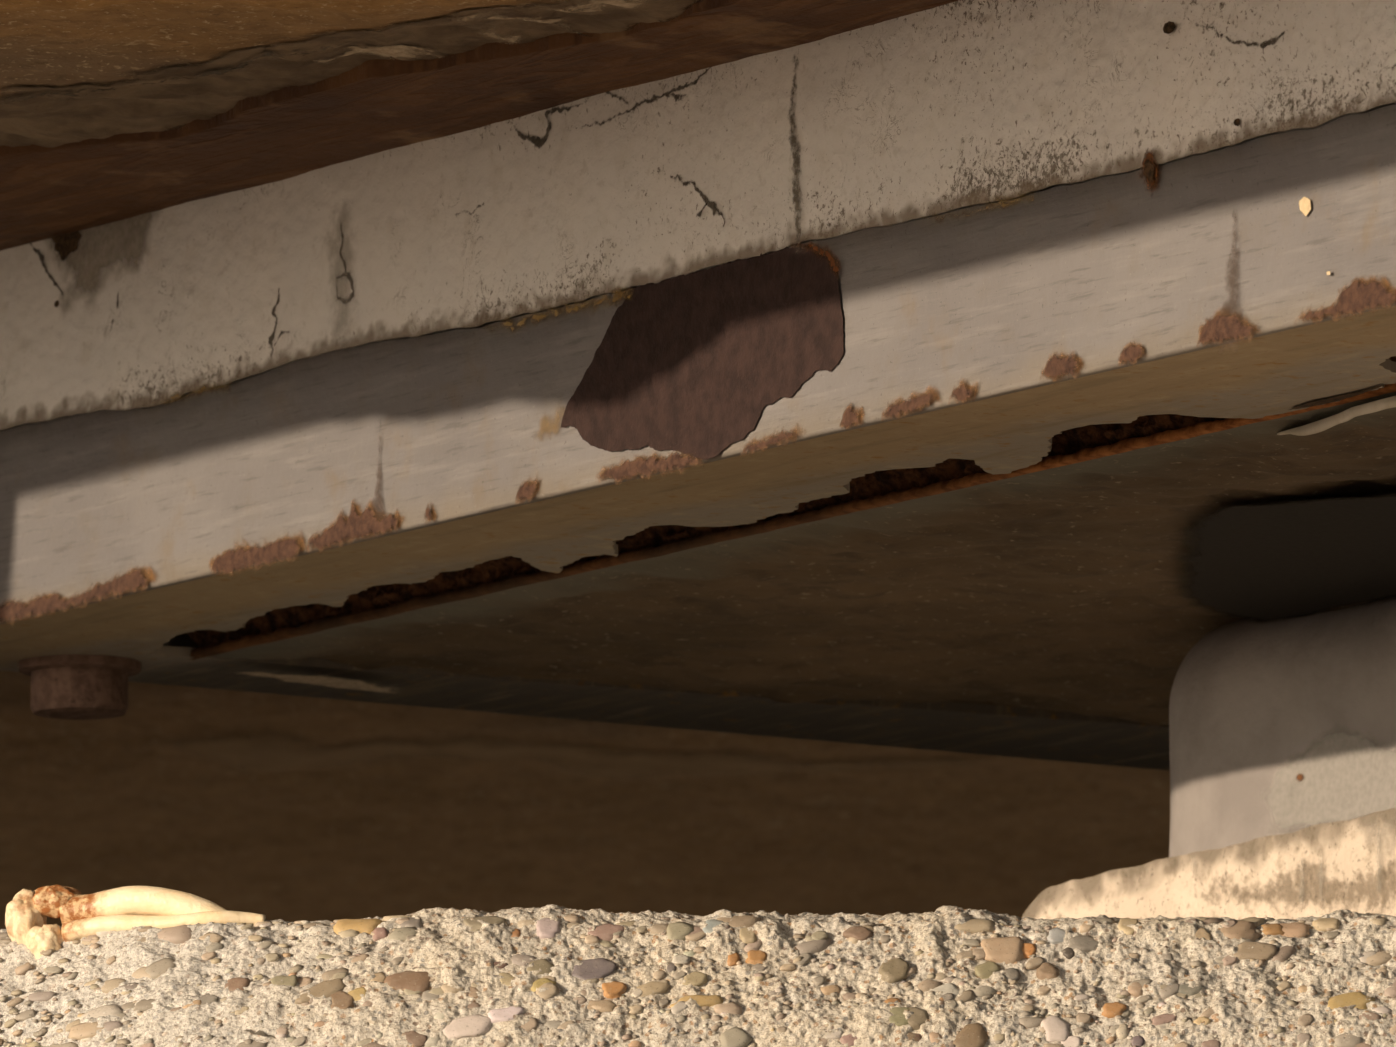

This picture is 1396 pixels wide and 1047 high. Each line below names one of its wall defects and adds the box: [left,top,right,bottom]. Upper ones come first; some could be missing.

crack [515,67,711,148]
crack [670,175,725,227]
crack [336,228,354,304]
corrosion [1198,232,1256,344]
corrosion [1300,277,1396,321]
peeling [561,242,844,460]
corrosion [1041,353,1082,380]
corrosion [1119,344,1144,364]
corrosion [190,381,1396,660]